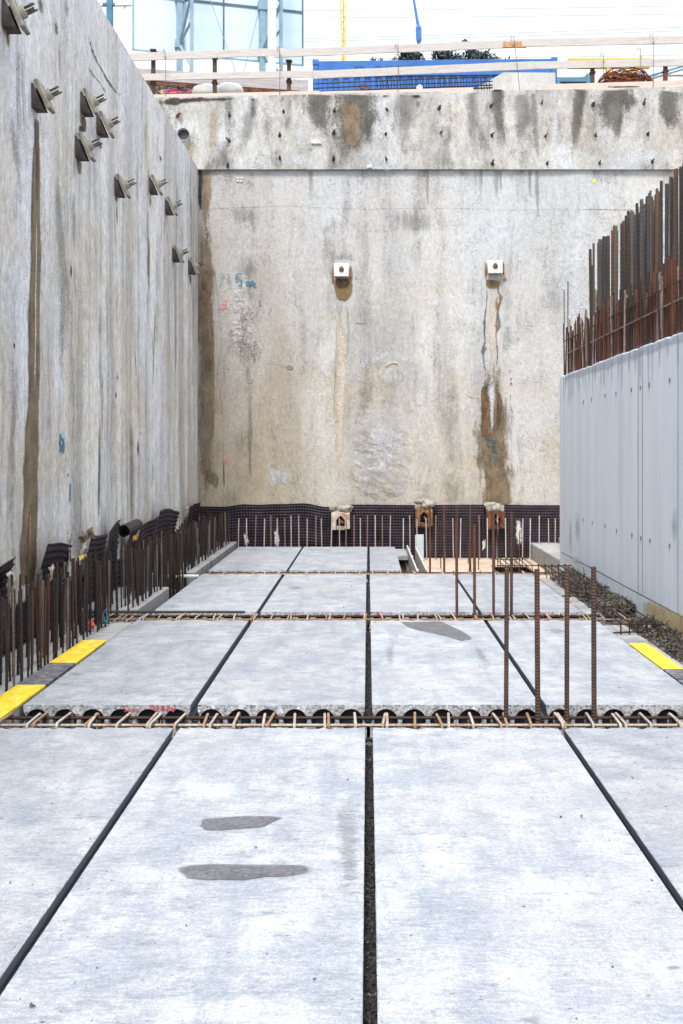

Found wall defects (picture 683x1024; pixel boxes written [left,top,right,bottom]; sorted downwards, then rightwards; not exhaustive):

damp [159,97,235,105]
damp [296,94,387,156]
damp [492,89,539,146]
damp [571,86,642,144]
damp [658,91,682,129]
damp [20,119,42,585]
damp [198,170,218,490]
rust [332,268,356,459]
rust [481,266,507,368]
damp [403,621,471,640]
damp [201,816,281,830]
damp [180,864,308,880]